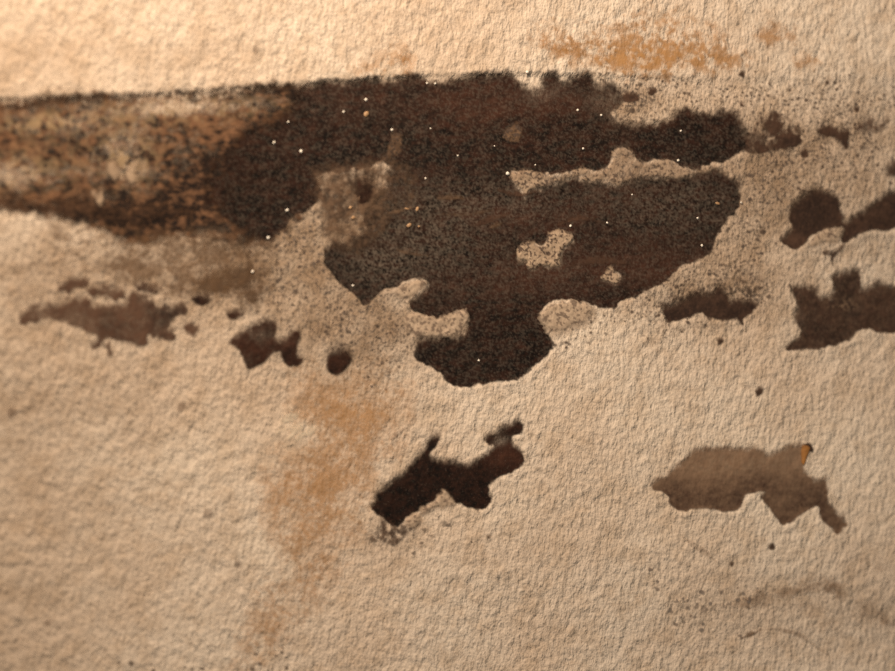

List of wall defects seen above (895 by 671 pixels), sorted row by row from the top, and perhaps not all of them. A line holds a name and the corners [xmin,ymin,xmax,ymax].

leakage [0,70,895,387]
leakage [371,421,524,545]
leakage [652,443,847,534]